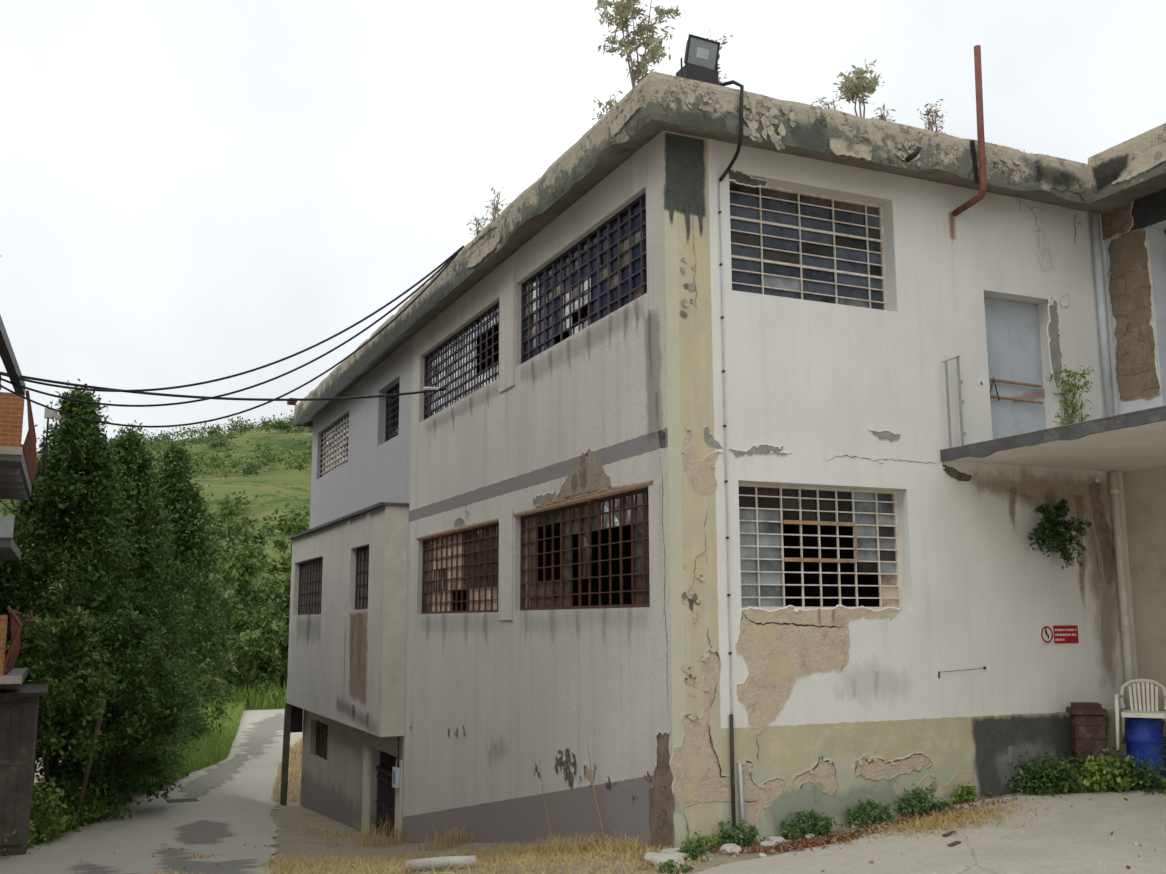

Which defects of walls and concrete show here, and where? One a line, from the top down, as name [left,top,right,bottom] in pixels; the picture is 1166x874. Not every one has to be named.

spalling [743,93,797,150]
damp [664,98,725,240]
spalling [1101,201,1162,401]
flaking render [533,448,614,507]
flaking render [681,425,793,497]
flaking render [868,429,901,443]
damp [981,478,1116,672]
damp [349,613,367,703]
flaking render [734,605,902,736]
flaking render [555,748,617,790]
flaking render [631,645,839,850]
flaking render [852,751,974,798]